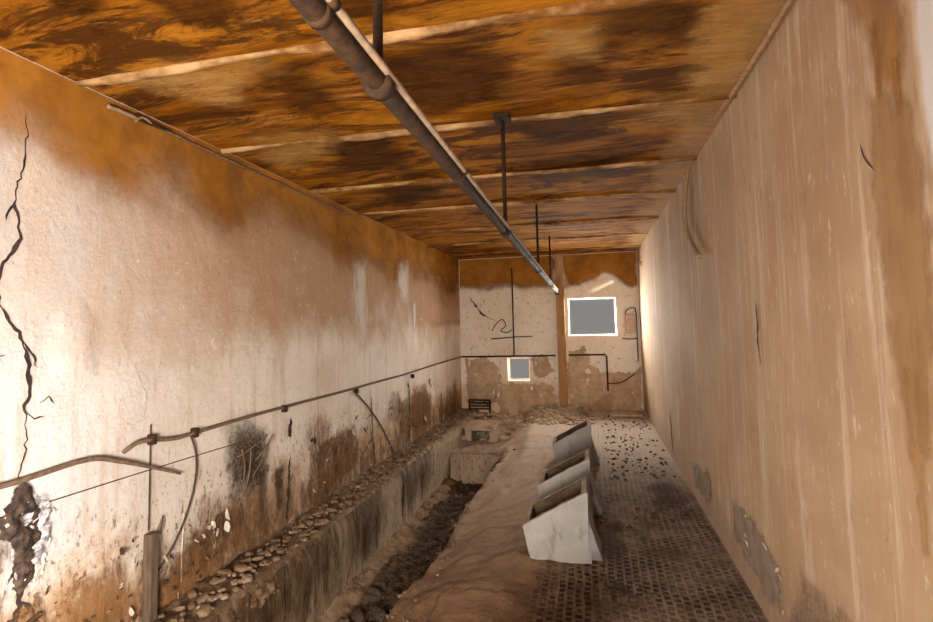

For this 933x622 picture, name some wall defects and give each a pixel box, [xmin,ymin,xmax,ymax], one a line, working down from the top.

water stain [148,0,237,27]
water stain [542,1,765,123]
water stain [0,48,638,330]
crack [0,115,54,478]
water stain [354,269,365,343]
spalling [0,482,142,622]